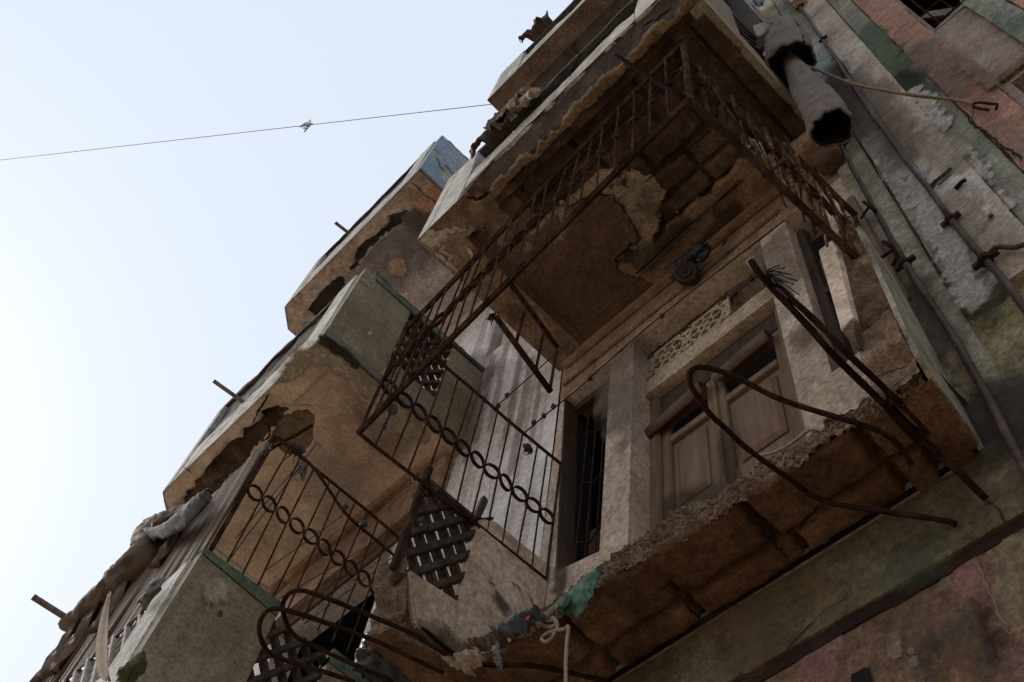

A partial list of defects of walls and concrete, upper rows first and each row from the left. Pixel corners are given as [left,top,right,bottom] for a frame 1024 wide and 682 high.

flaking render [350,210,430,271]
flaking render [486,0,762,276]
flaking render [180,405,315,503]
spalling [594,258,989,594]